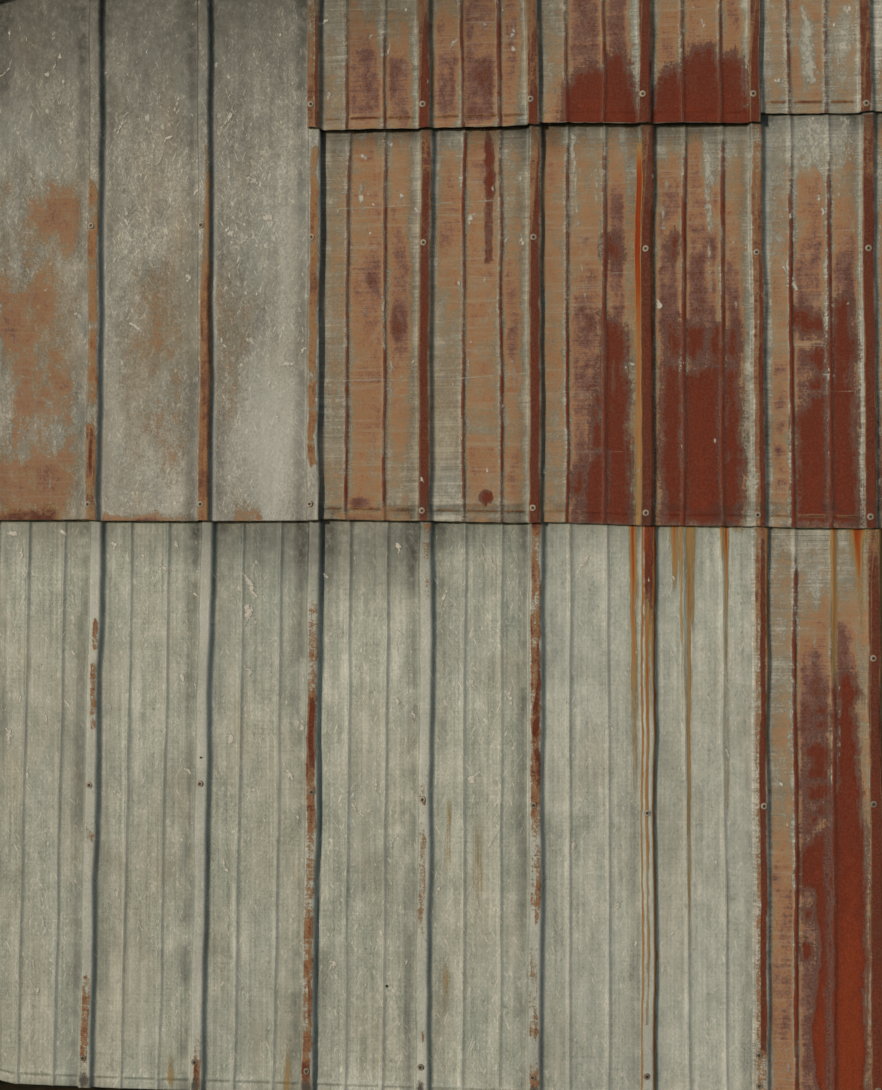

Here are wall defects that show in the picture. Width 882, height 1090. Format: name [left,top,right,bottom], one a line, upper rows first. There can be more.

corrosion [0,147,248,521]
corrosion [307,0,882,1090]
corrosion [284,605,318,1090]